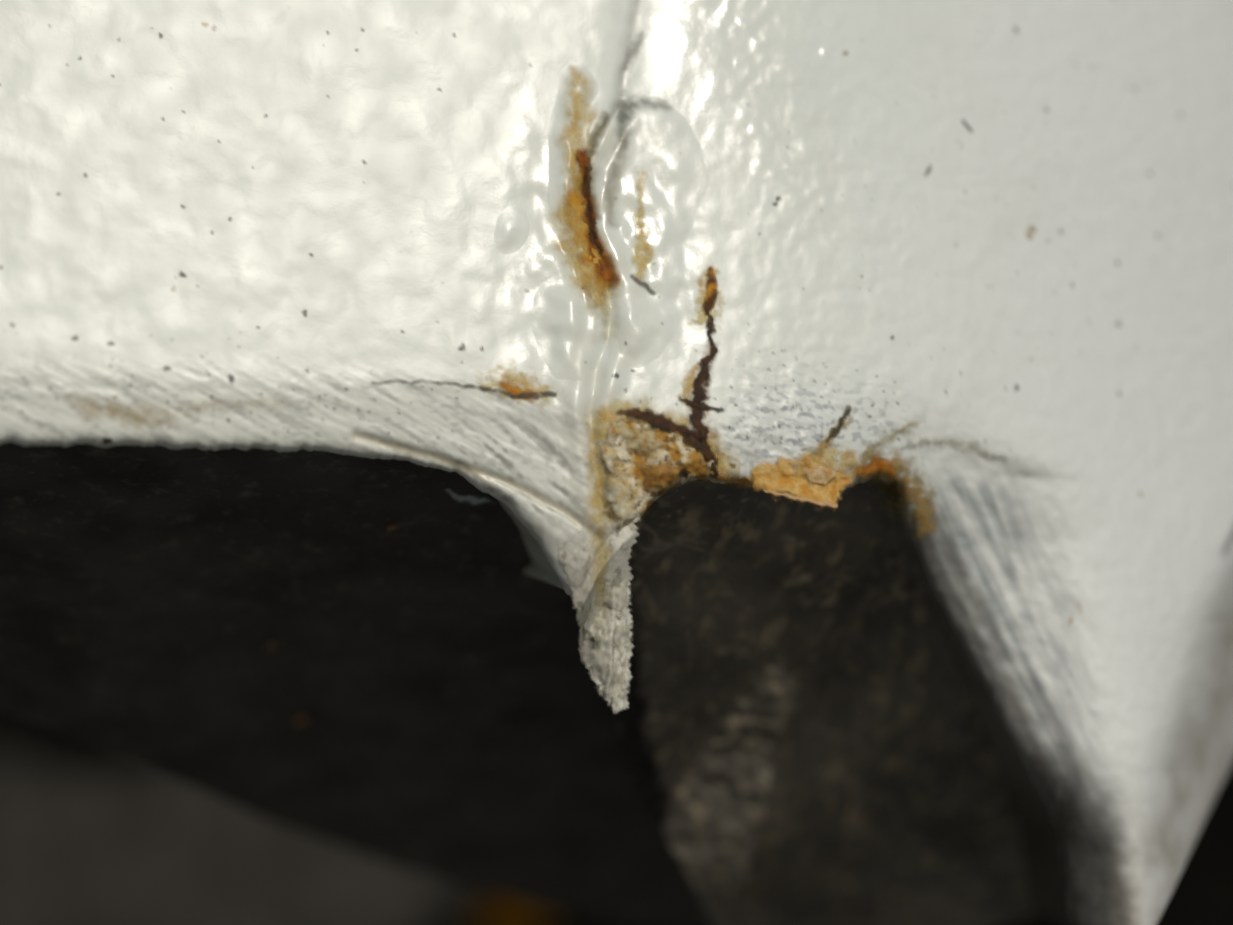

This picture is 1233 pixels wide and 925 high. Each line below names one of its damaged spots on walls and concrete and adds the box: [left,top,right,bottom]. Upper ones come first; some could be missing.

rust [557,72,655,305]
rust [484,373,548,399]
crack [618,311,723,477]
rust [713,406,936,536]
peeling [558,403,730,712]